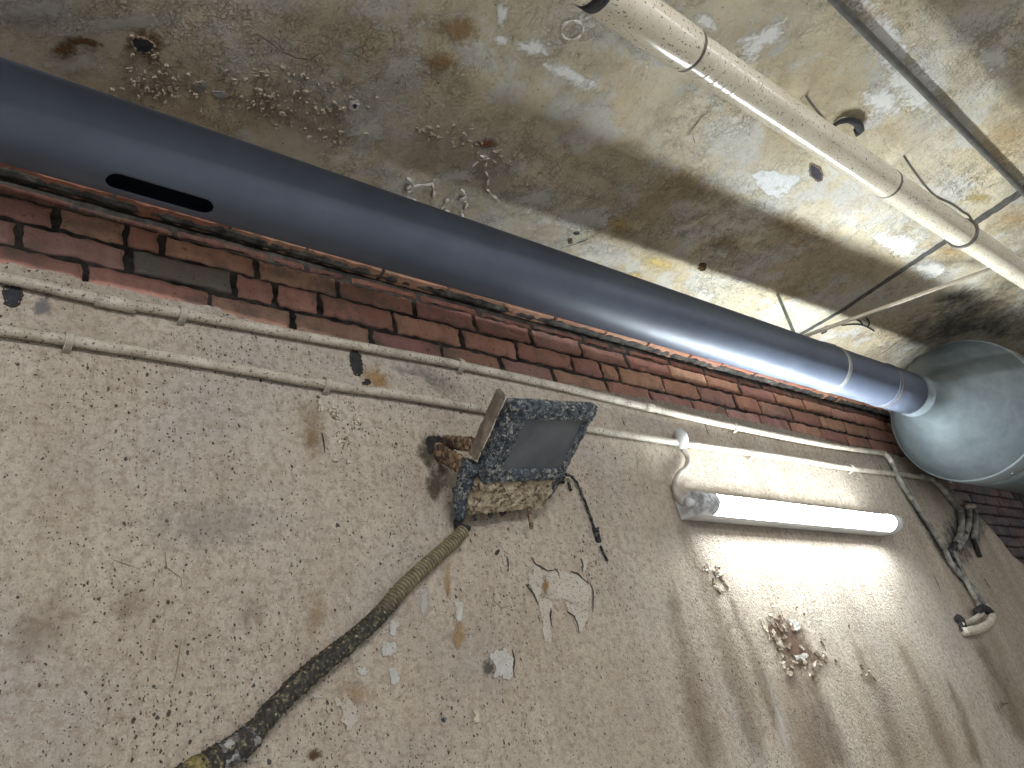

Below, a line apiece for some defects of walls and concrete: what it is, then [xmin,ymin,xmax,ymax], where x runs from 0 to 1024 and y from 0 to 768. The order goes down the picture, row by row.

rust [53,37,101,60]
peeling [110,52,380,145]
peeling [751,170,802,197]
peeling [526,555,594,643]
spalling [702,564,730,595]
peeling [382,619,400,685]
peeling [490,648,514,680]
spalling [760,601,838,682]